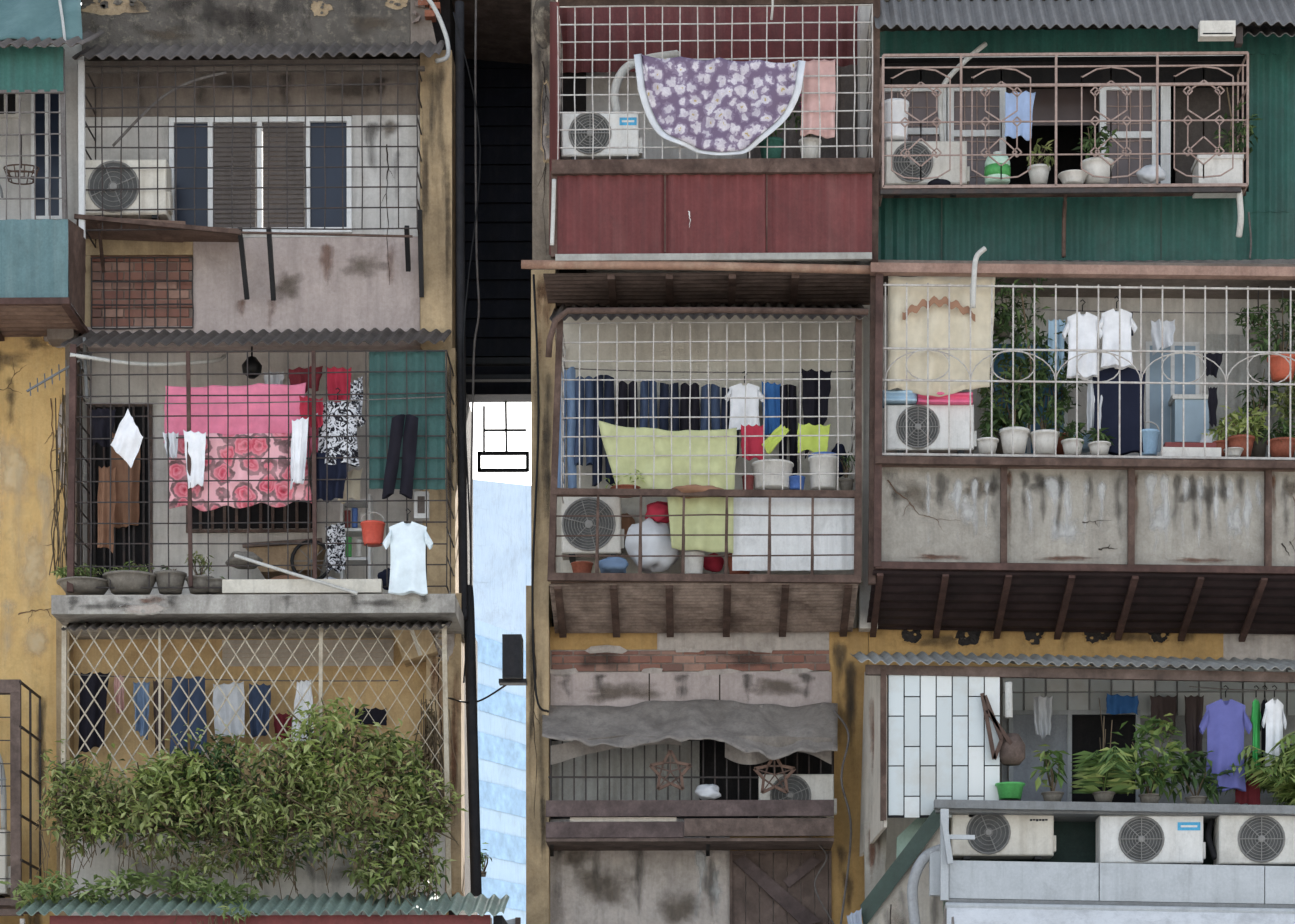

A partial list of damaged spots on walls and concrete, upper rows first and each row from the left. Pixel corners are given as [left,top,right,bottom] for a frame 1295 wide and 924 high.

spalling [81,0,152,17]
spalling [308,0,335,18]
flaking render [382,0,441,23]
crack [887,480,960,532]
damp [894,477,995,520]
damp [1022,474,1075,537]
damp [1146,475,1260,534]
damp [584,656,654,699]
damp [765,674,809,692]
damp [568,851,618,900]
damp [667,852,720,921]